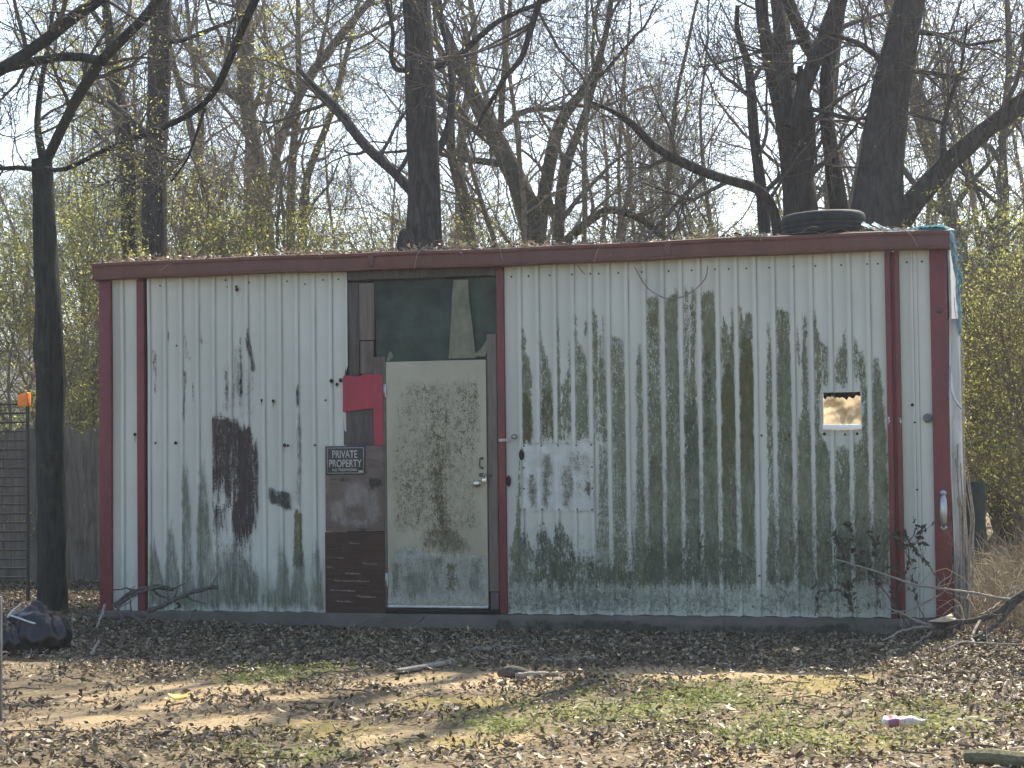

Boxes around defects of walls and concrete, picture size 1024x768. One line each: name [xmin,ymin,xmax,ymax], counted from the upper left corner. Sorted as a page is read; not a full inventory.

water stain [149,473,323,609]
water stain [331,386,484,596]
water stain [522,291,890,590]